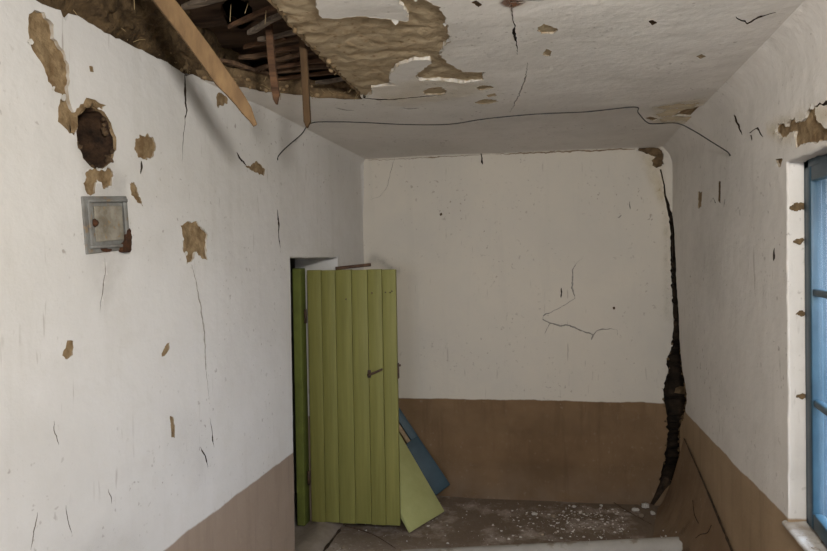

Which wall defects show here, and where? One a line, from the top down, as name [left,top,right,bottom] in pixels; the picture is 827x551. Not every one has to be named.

spalling [360,0,498,104]
spalling [27,10,117,196]
spalling [134,133,156,160]
spalling [216,92,228,108]
spalling [244,161,265,176]
spalling [775,103,827,148]
spalling [180,221,208,263]
crack [542,260,618,340]
crack [650,169,687,505]